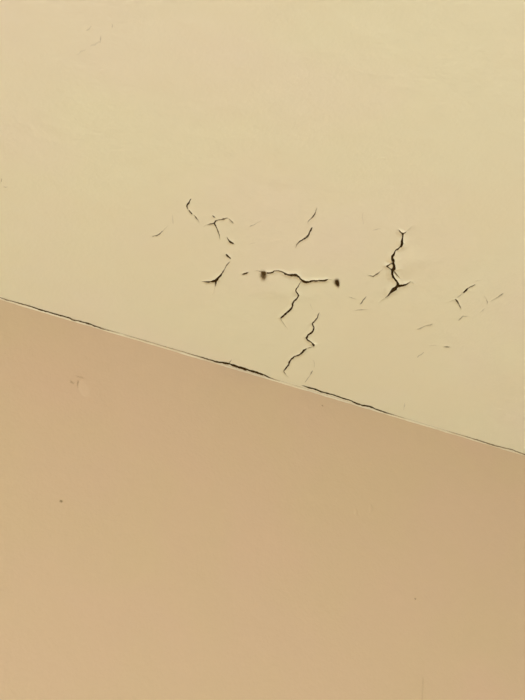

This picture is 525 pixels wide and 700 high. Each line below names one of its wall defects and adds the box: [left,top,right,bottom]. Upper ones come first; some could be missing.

crack [2,298,113,332]
crack [184,197,397,416]
crack [352,225,416,312]
crack [463,435,525,455]